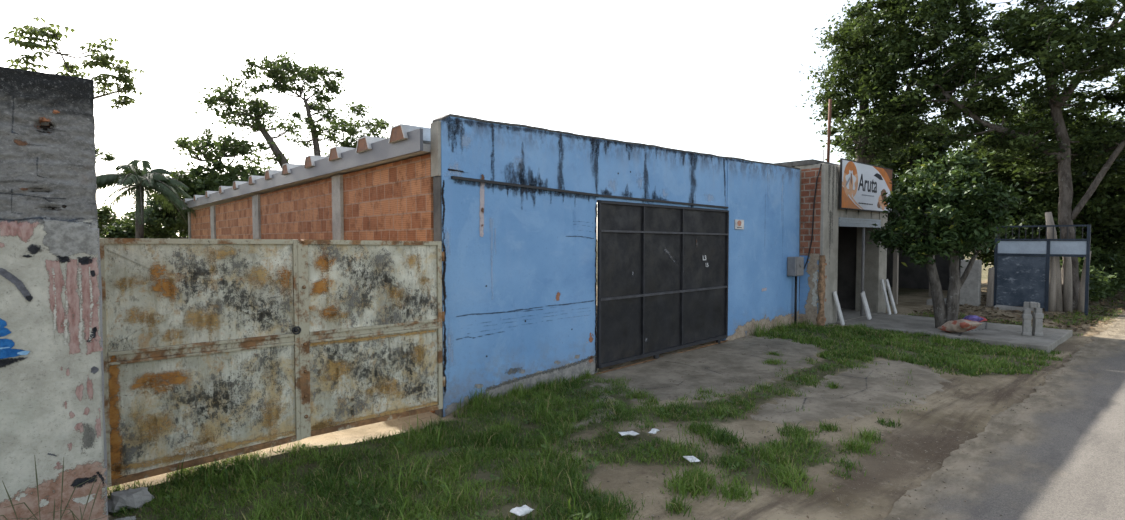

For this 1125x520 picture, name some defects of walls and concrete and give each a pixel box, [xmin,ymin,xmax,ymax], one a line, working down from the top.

spalling [36,110,60,133]
leakage [444,118,752,208]
peeling [0,205,103,451]
peeling [0,460,111,520]